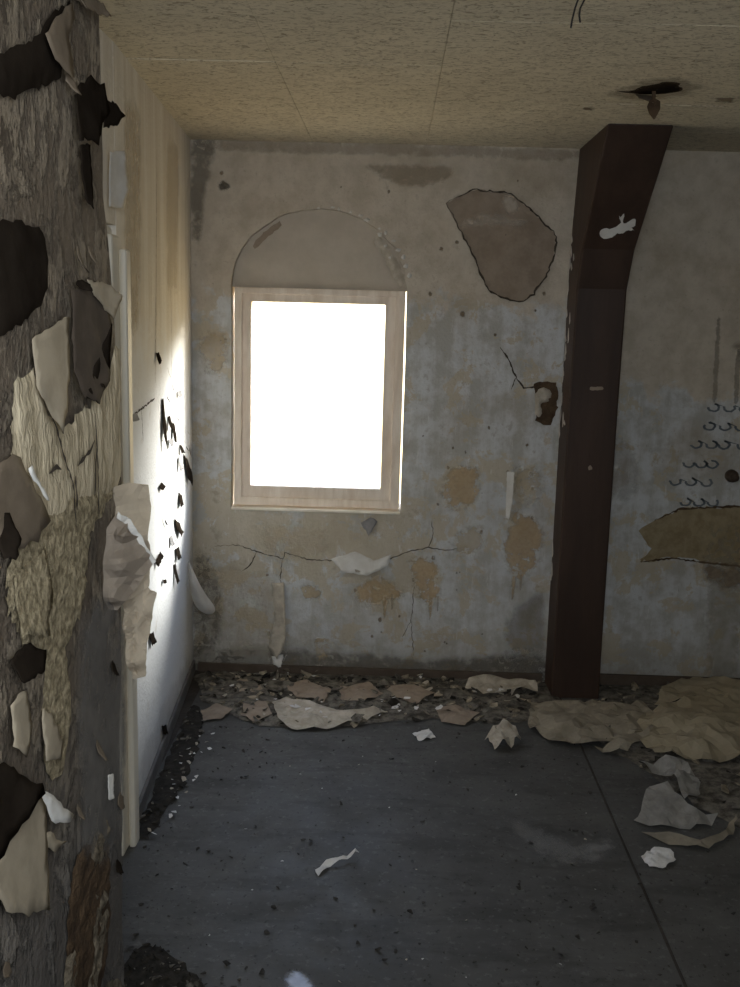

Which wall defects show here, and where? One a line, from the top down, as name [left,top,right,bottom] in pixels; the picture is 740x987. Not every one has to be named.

flaking render [0,0,125,209]
flaking render [618,82,683,119]
peeling [109,151,130,208]
flaking render [0,219,48,336]
flaking render [446,189,558,302]
peeling [600,214,636,239]
flaking render [534,311,570,437]
flaking render [0,260,215,917]
crack [218,544,332,581]
peeling [331,552,391,576]
crack [390,523,457,559]
flaking render [639,505,740,588]